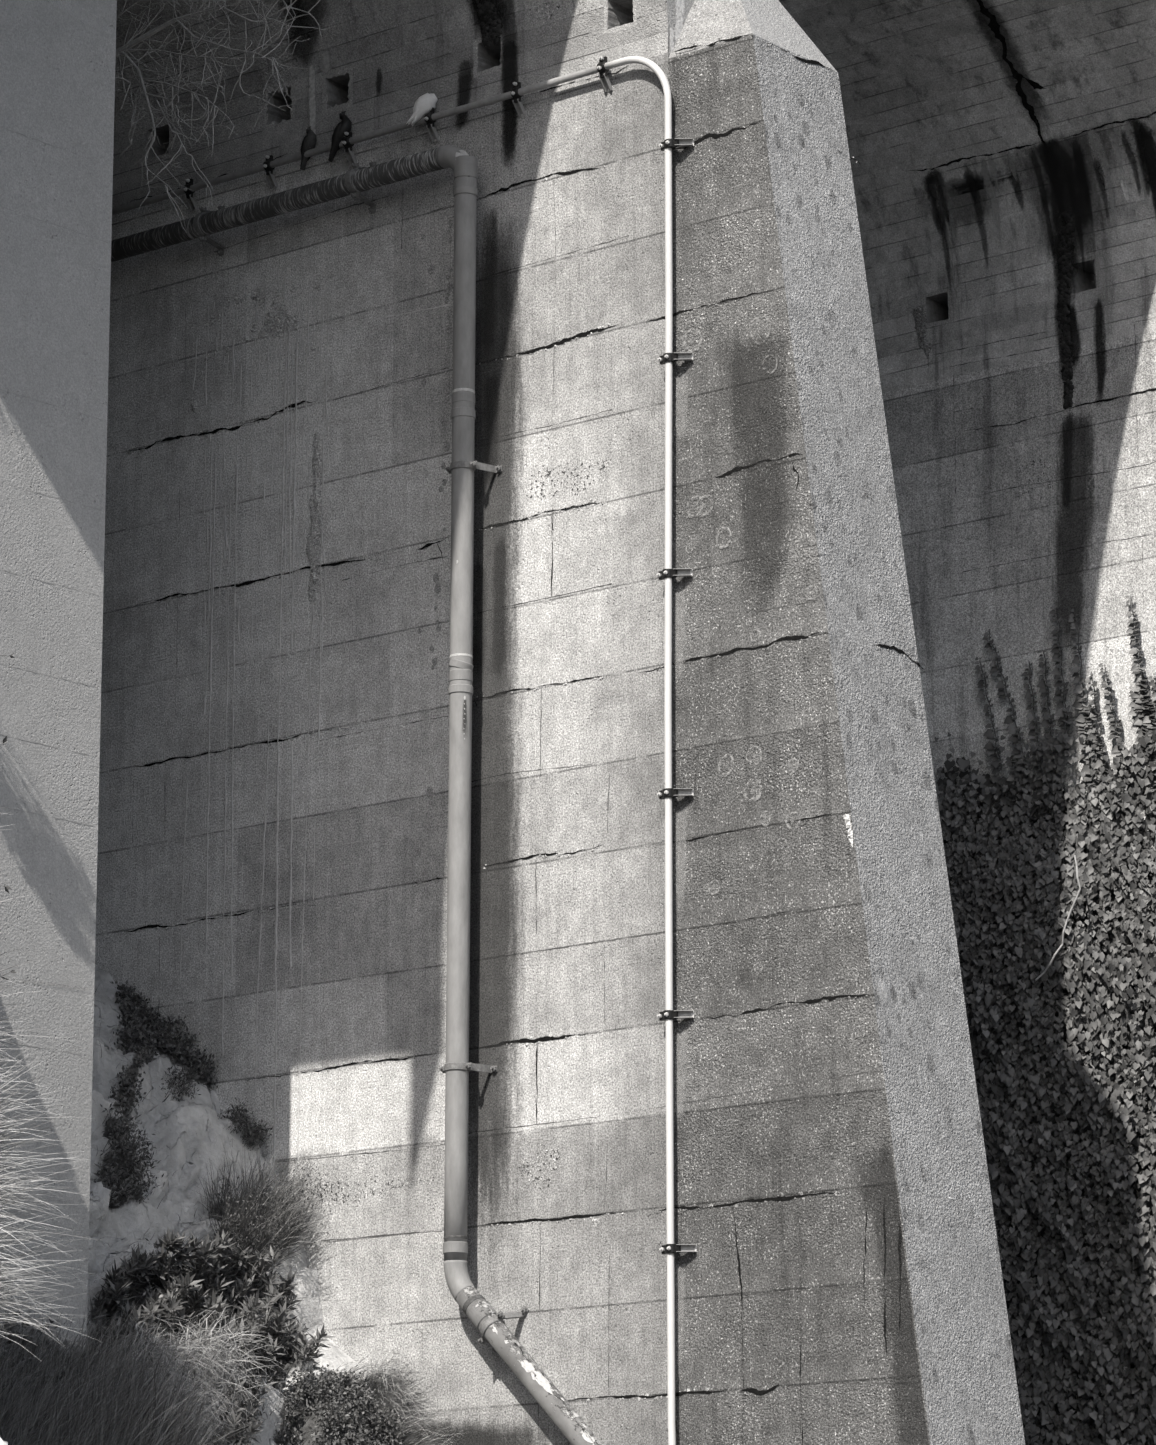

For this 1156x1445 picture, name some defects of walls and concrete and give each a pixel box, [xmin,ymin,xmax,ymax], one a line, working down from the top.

crack [478,166,606,199]
damp [925,156,1023,281]
damp [1032,120,1156,400]
crack [479,290,778,365]
crack [127,400,321,455]
crack [644,632,819,674]
crack [876,644,927,671]
crack [131,724,358,767]
damp [192,329,327,1163]
crack [472,1190,902,1444]